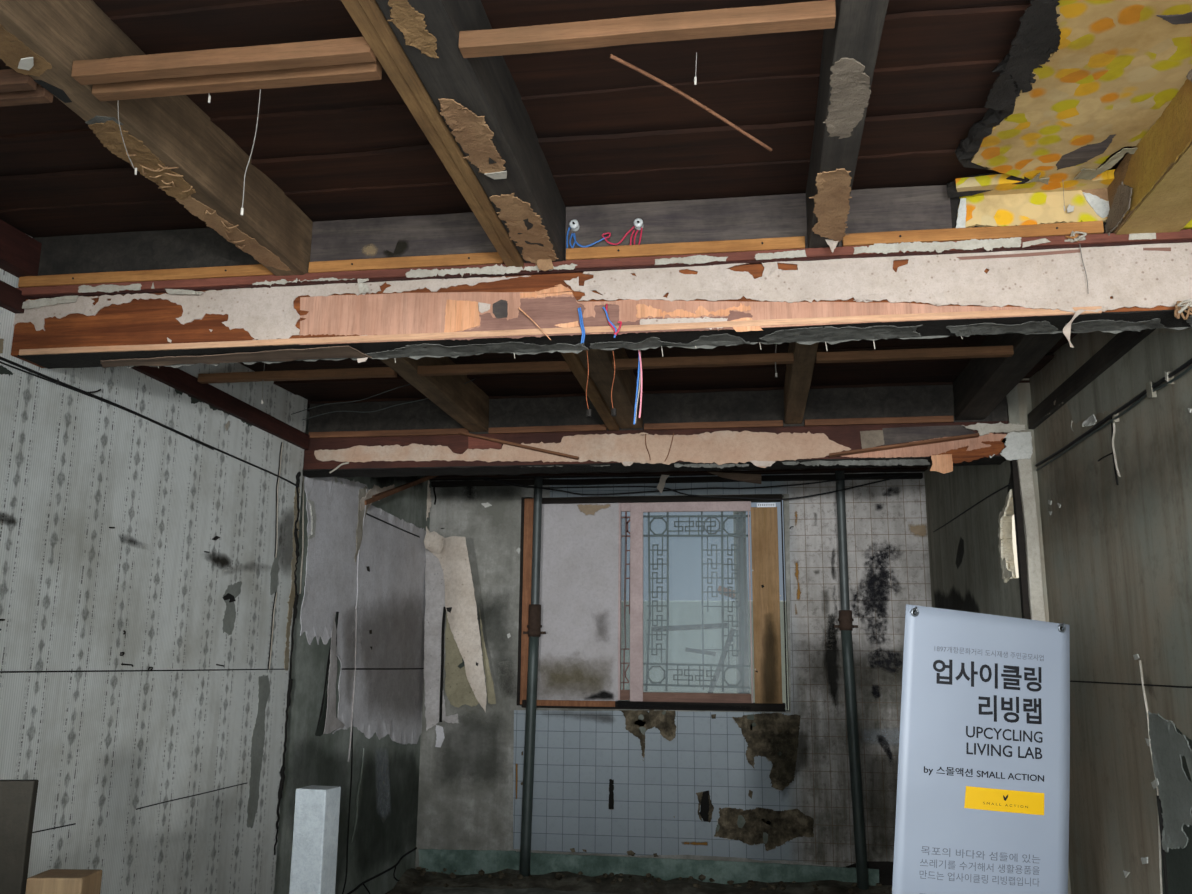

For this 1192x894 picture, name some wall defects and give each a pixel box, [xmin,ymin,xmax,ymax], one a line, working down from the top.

peeling [126,151,193,192]
peeling [484,171,507,180]
peeling [358,278,370,294]
peeling [0,338,13,376]
peeling [17,309,1192,427]
mould [852,545,903,672]
mould [824,607,839,705]
spalling [619,710,676,761]
spalling [733,713,801,791]
peeling [1145,711,1192,852]
spalling [696,790,814,851]